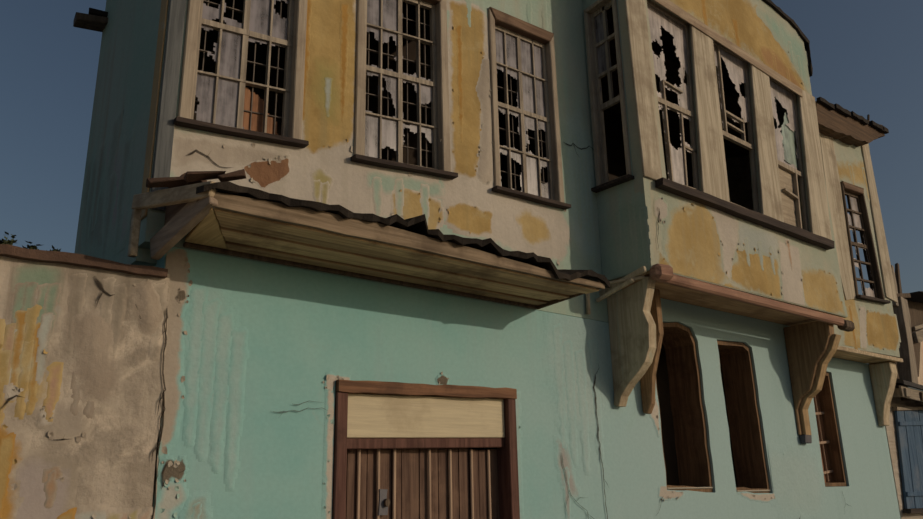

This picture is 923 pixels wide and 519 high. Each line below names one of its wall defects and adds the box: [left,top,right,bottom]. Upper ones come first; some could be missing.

peeling [669,0,812,95]
peeling [170,0,573,269]
crack [95,278,115,306]
peeling [652,196,901,355]
peeling [0,304,95,519]
crack [152,309,168,481]
crack [277,401,326,413]
crack [562,369,608,519]